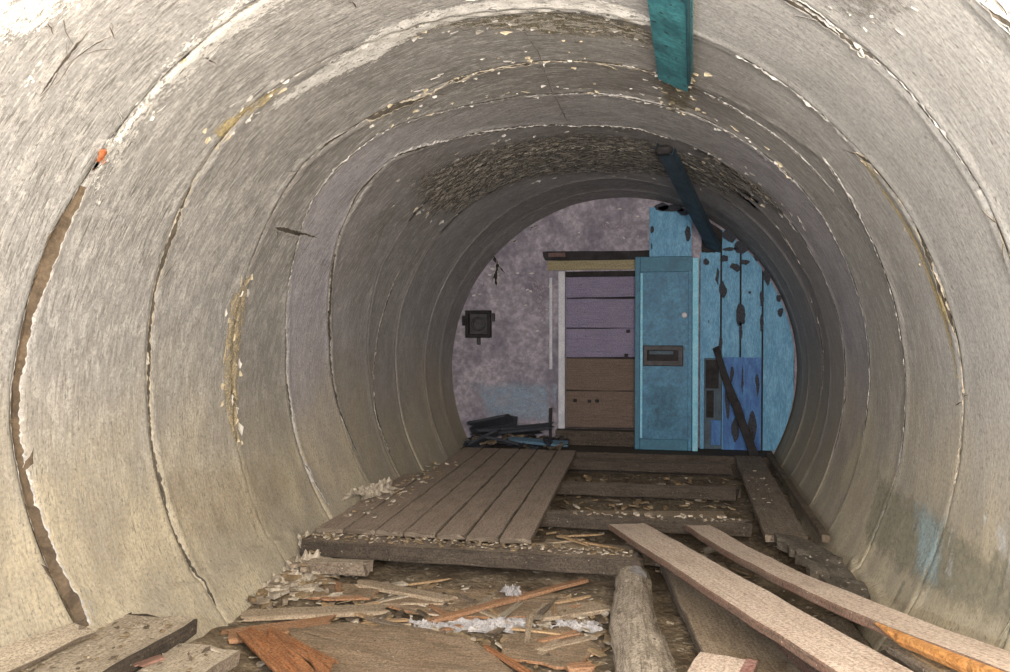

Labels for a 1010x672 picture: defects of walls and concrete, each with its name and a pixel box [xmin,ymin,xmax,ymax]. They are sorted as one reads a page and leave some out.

crack [9,4,250,627]
peeling [89,0,302,210]
peeling [220,274,253,446]
peeling [203,0,651,144]
peeling [392,128,806,232]
crack [230,7,969,505]
crack [782,0,1010,262]
leakage [867,483,1010,649]